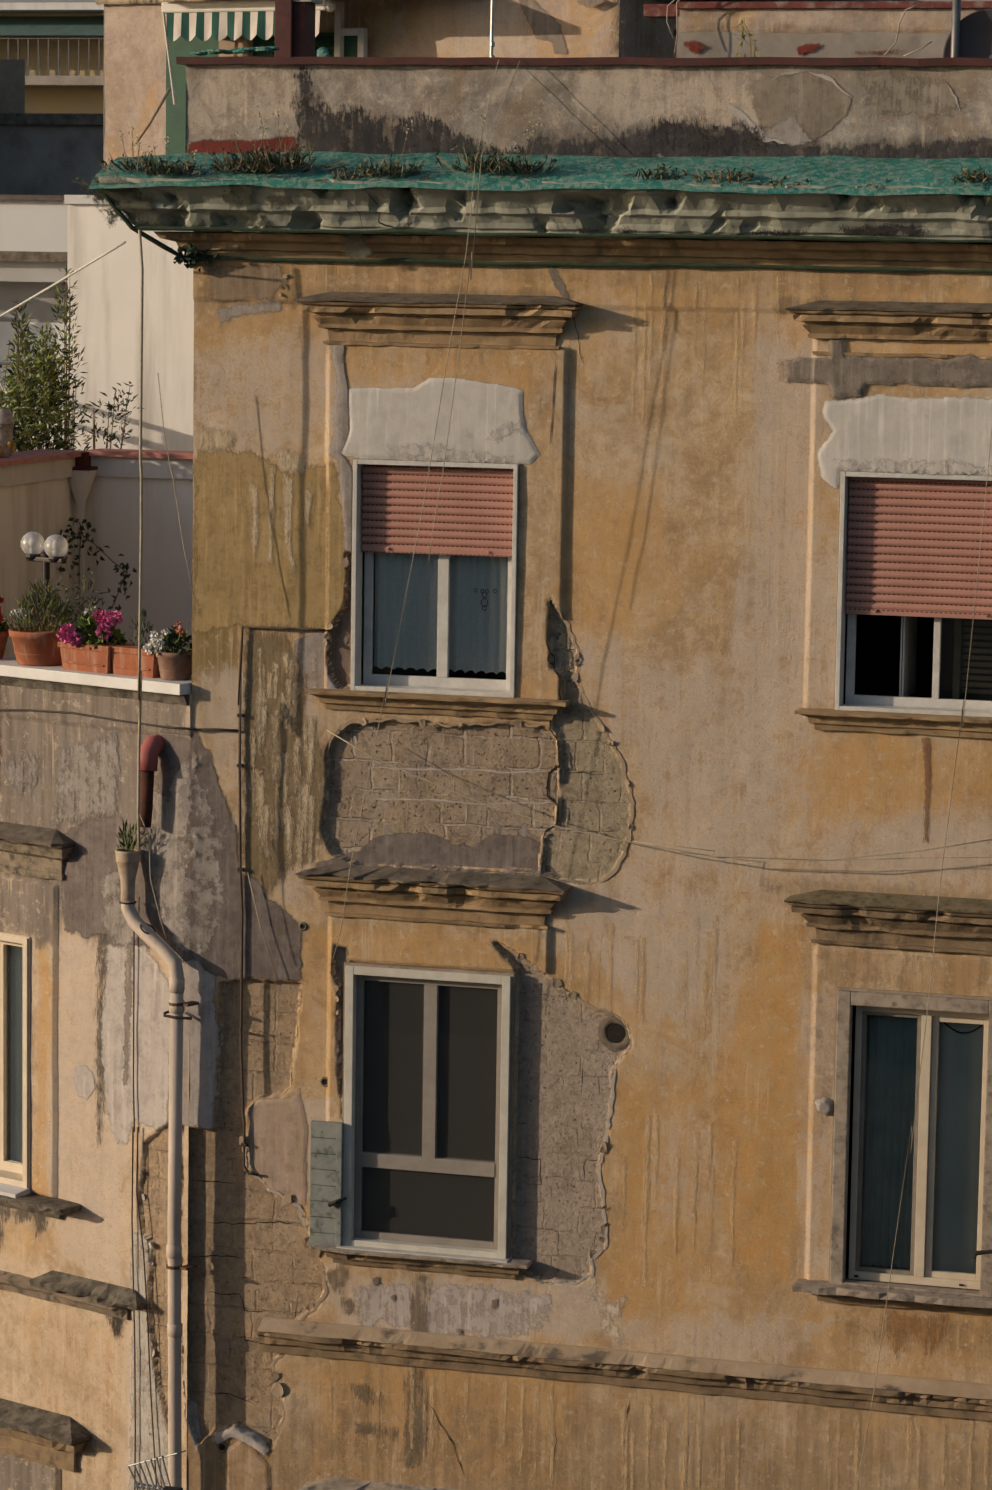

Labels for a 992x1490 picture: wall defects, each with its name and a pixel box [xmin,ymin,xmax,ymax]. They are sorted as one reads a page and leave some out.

leakage [292,65,992,159]
peeling [684,40,706,54]
spalling [727,43,966,146]
flaking render [192,423,635,896]
flaking render [137,978,328,1454]
spalling [352,939,631,1338]